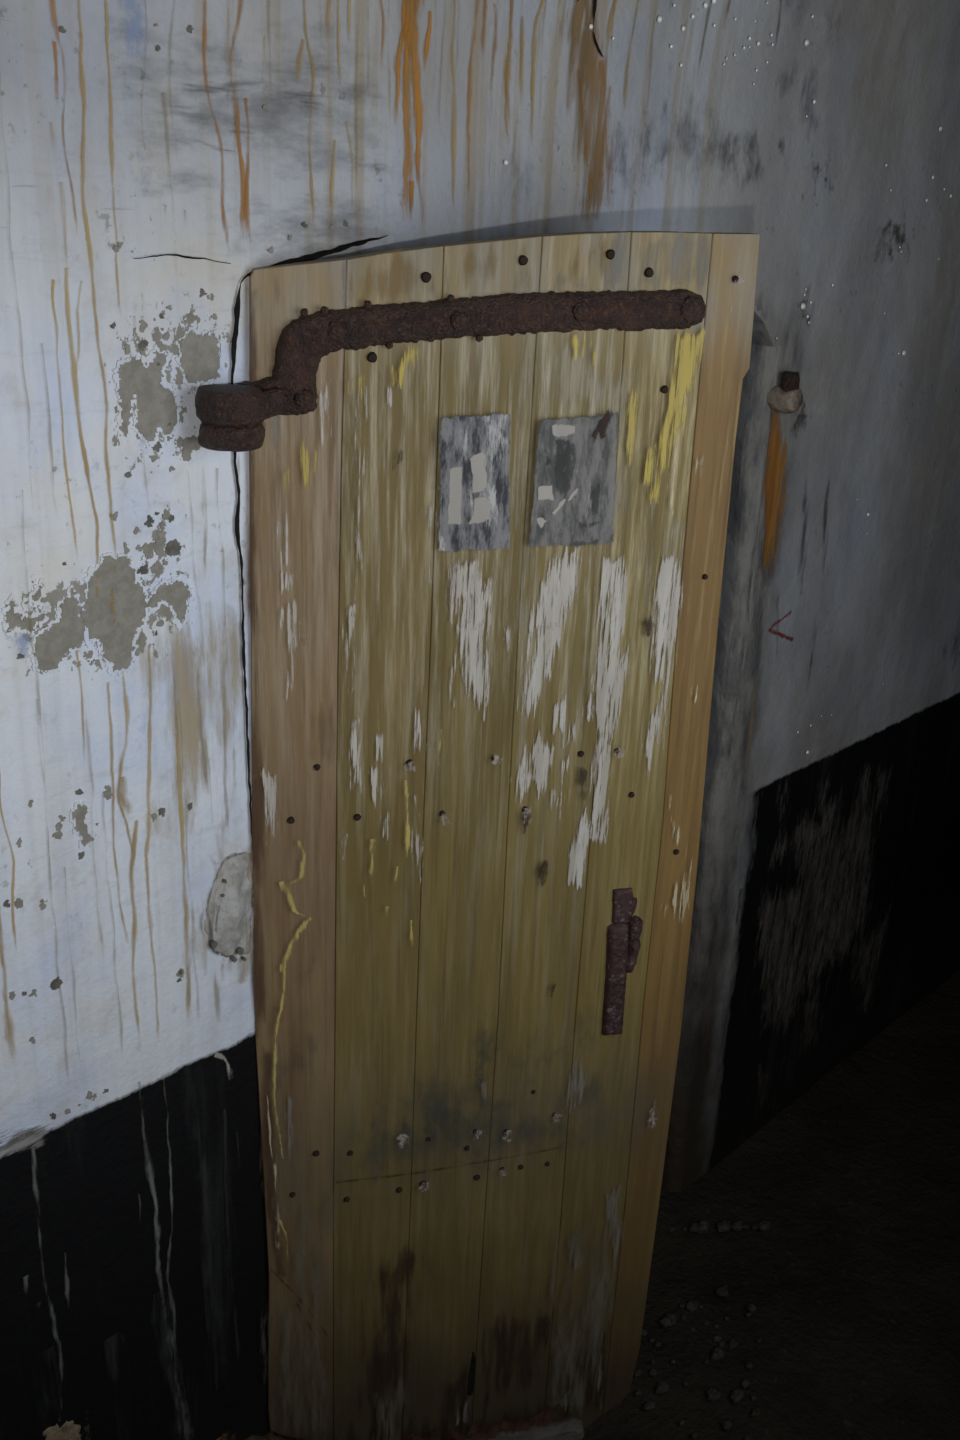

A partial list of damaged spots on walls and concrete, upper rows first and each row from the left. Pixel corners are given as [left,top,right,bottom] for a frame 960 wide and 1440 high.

rust [216,98,249,225]
rust [382,0,432,206]
rust [452,0,544,194]
crack [578,0,603,57]
rust [51,0,114,564]
peeling [102,288,241,478]
rust [762,410,787,569]
peeling [1,499,194,677]
rust [0,799,15,970]
rust [108,682,156,1024]
rust [177,741,185,864]
spalling [43,1420,88,1440]